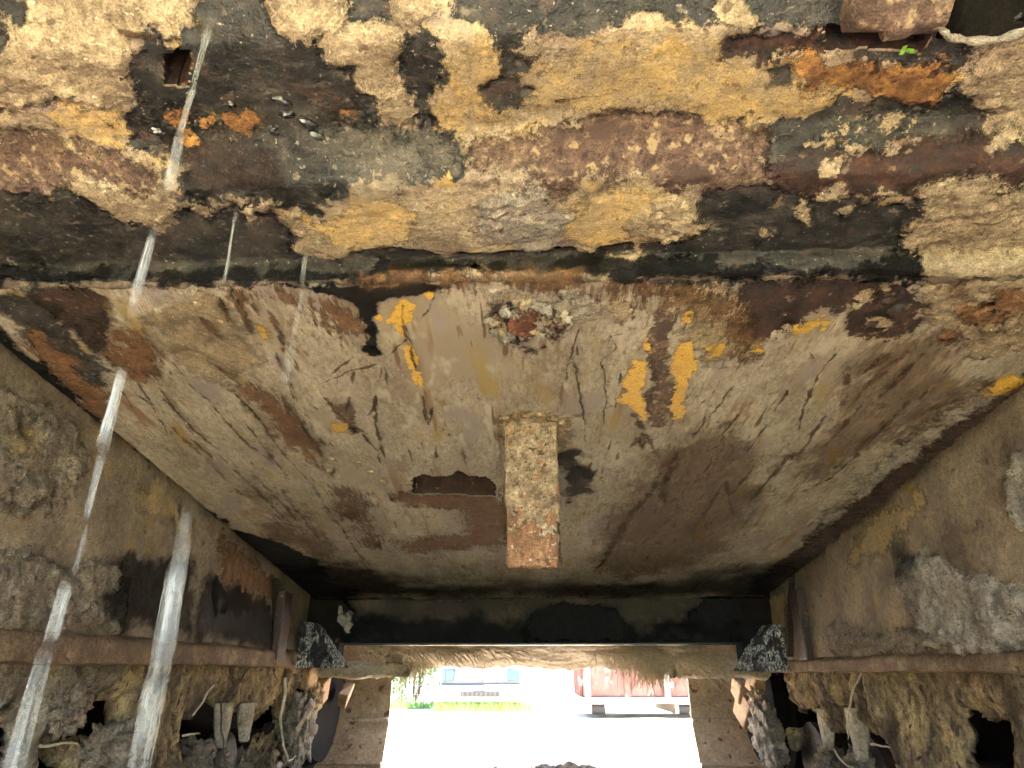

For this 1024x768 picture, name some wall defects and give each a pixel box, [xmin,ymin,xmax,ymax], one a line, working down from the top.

rust [712,24,963,108]
rust [0,107,285,200]
rust [337,109,359,126]
rust [15,318,331,552]
rust [189,283,507,574]
leakage [557,449,597,504]
crack [566,328,626,457]
rust [341,256,1024,585]
leakage [220,519,323,572]